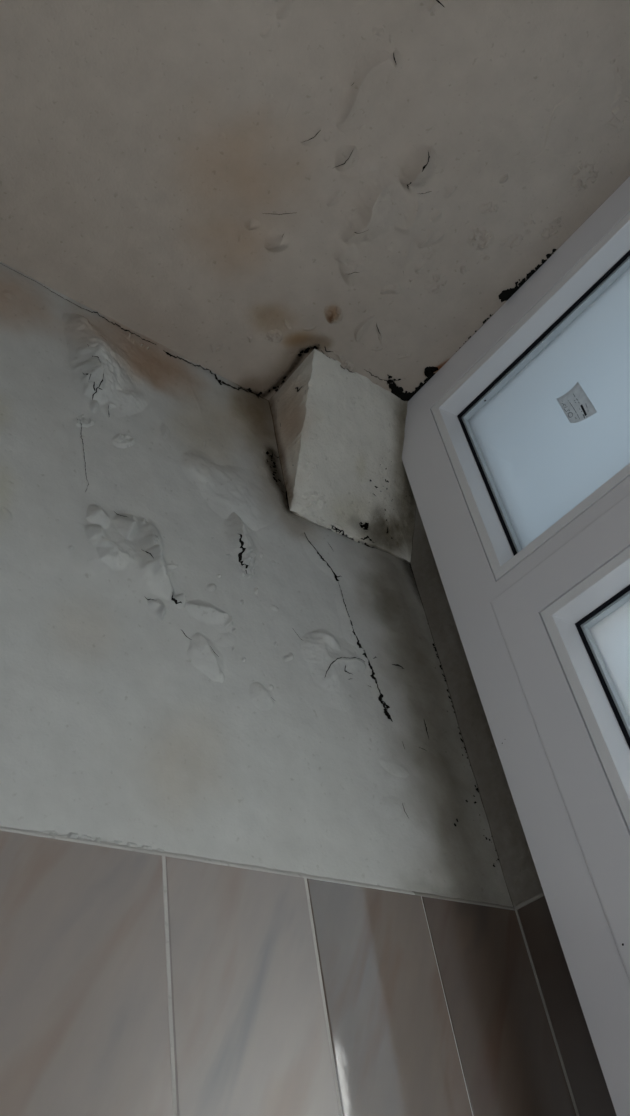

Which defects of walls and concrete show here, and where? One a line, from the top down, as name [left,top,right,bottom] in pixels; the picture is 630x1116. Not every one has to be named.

crack [294,513,429,750]